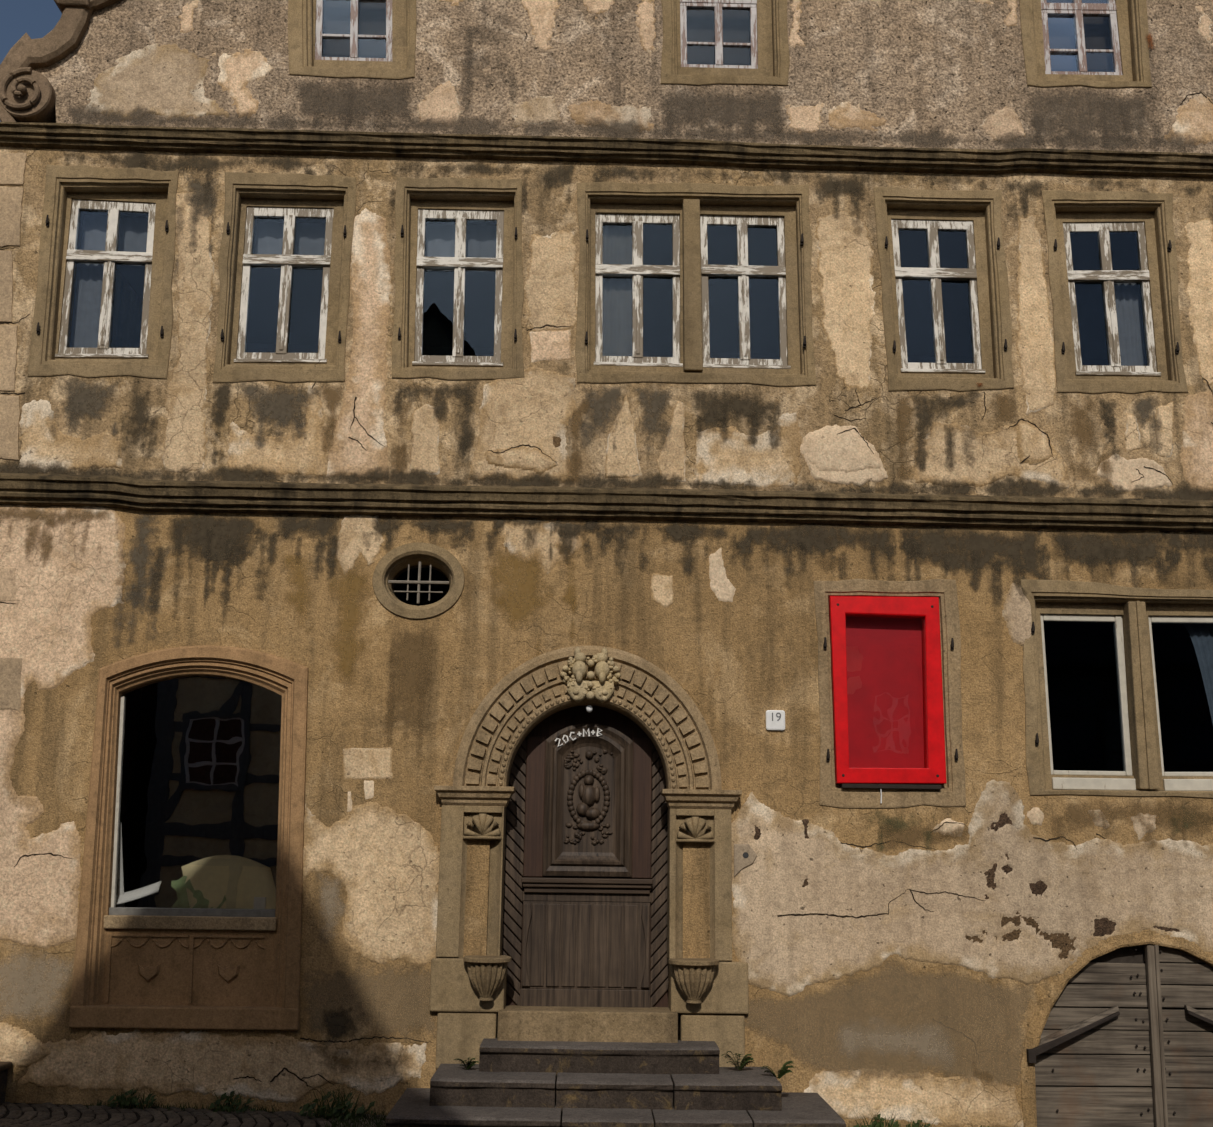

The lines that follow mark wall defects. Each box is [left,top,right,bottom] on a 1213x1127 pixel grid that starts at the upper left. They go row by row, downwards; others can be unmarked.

damp [212,383,341,448]
crack [348,397,385,451]
damp [395,383,475,455]
damp [694,391,779,446]
damp [897,392,979,478]
damp [115,512,365,675]
damp [658,521,1213,604]
peeling [0,505,126,949]
peeling [303,747,440,967]
crack [777,889,986,918]
peeling [731,779,1213,997]
peeling [803,1070,1023,1127]